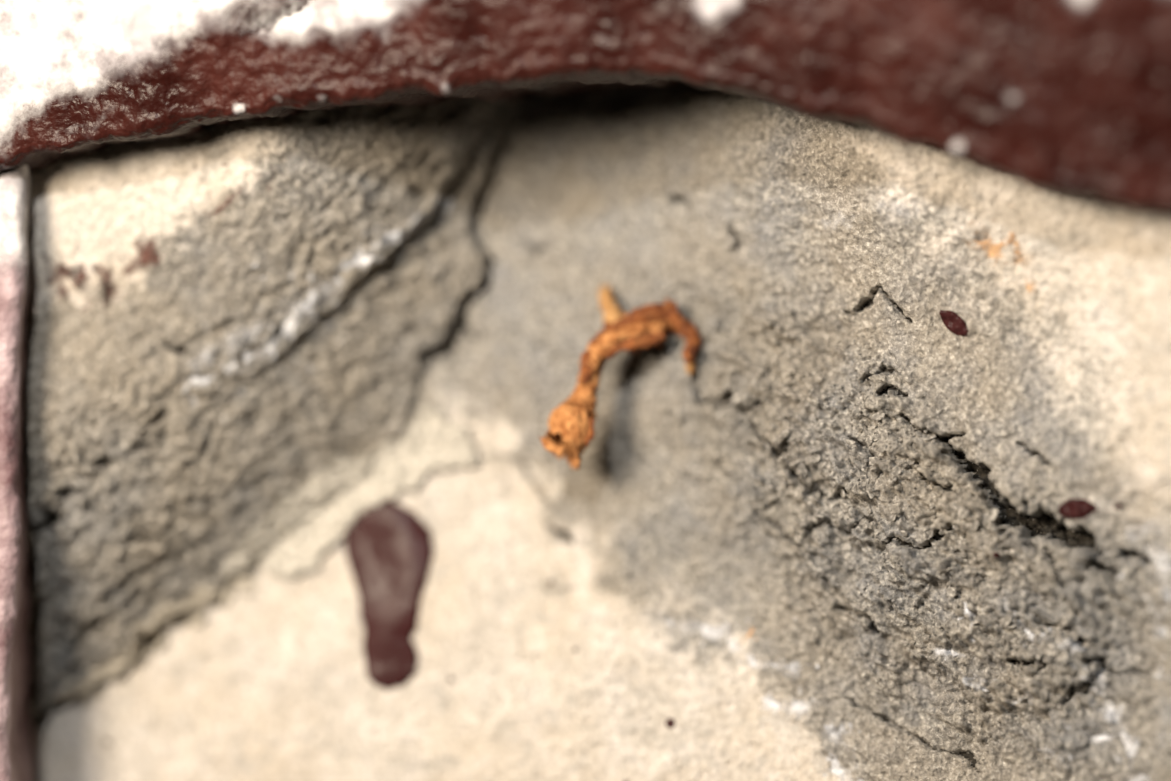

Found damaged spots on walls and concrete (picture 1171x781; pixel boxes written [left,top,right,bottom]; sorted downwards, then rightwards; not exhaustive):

damp [383,231,403,244]
crack [374,105,504,272]
damp [266,252,390,357]
crack [422,259,495,359]
damp [191,361,211,385]
spalling [711,381,755,444]
peeling [53,402,481,707]
spalling [757,443,849,525]
spalling [846,412,999,611]
crack [867,367,1152,583]
crack [839,607,879,632]
spalling [976,565,1089,708]